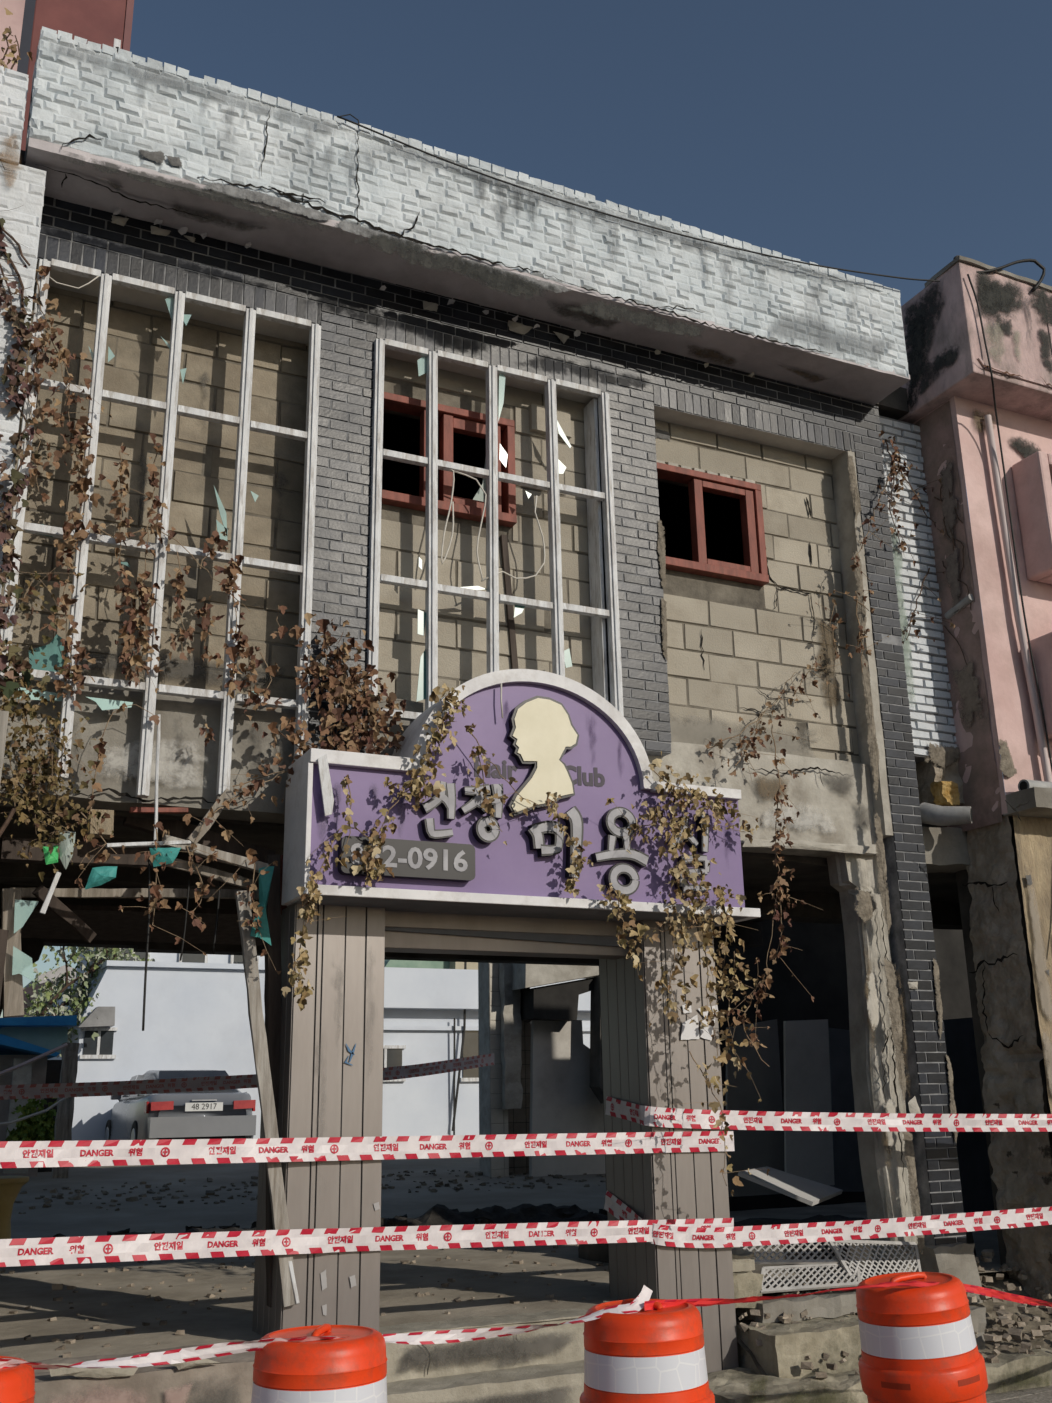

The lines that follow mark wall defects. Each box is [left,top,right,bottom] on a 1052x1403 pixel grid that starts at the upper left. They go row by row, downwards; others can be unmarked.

crack [0,134,207,219]
crack [197,104,833,354]
leakage [356,235,734,365]
mould [904,284,958,410]
leakage [977,272,1052,372]
crack [751,767,854,784]
crack [962,881,1008,911]
crack [969,953,1023,1049]